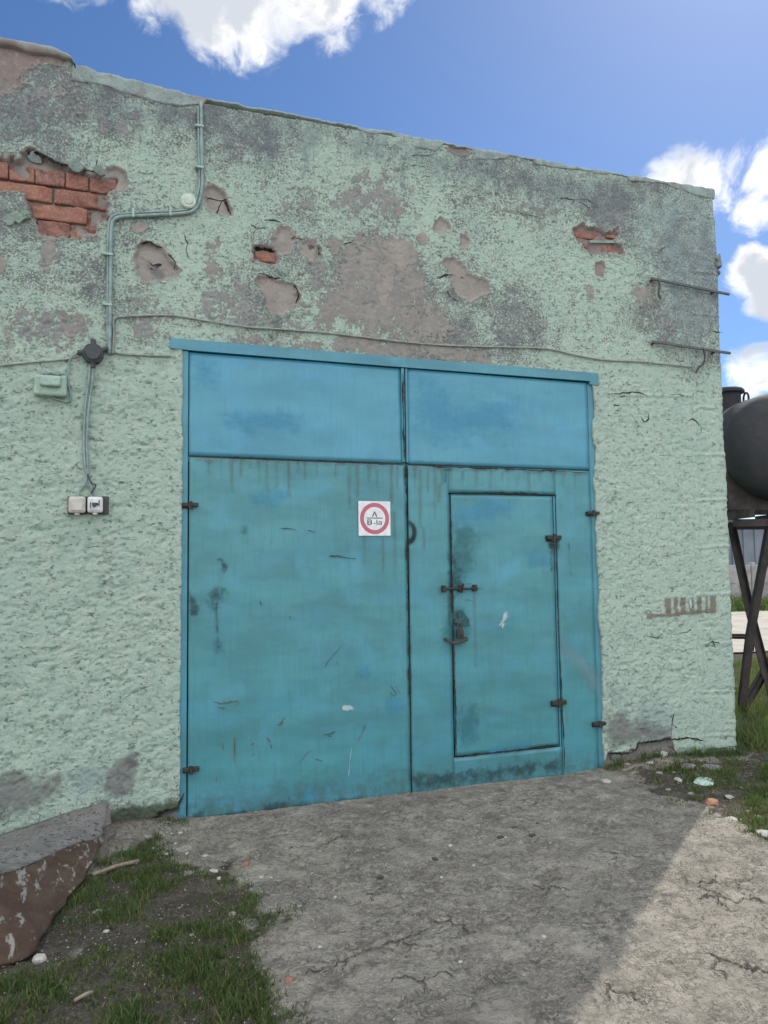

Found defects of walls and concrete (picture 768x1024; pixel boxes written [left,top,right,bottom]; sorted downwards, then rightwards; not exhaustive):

peeling [0,145,511,366]
flaking render [503,194,626,303]
rust [193,378,589,793]
damp [106,756,137,794]
crack [668,713,735,753]